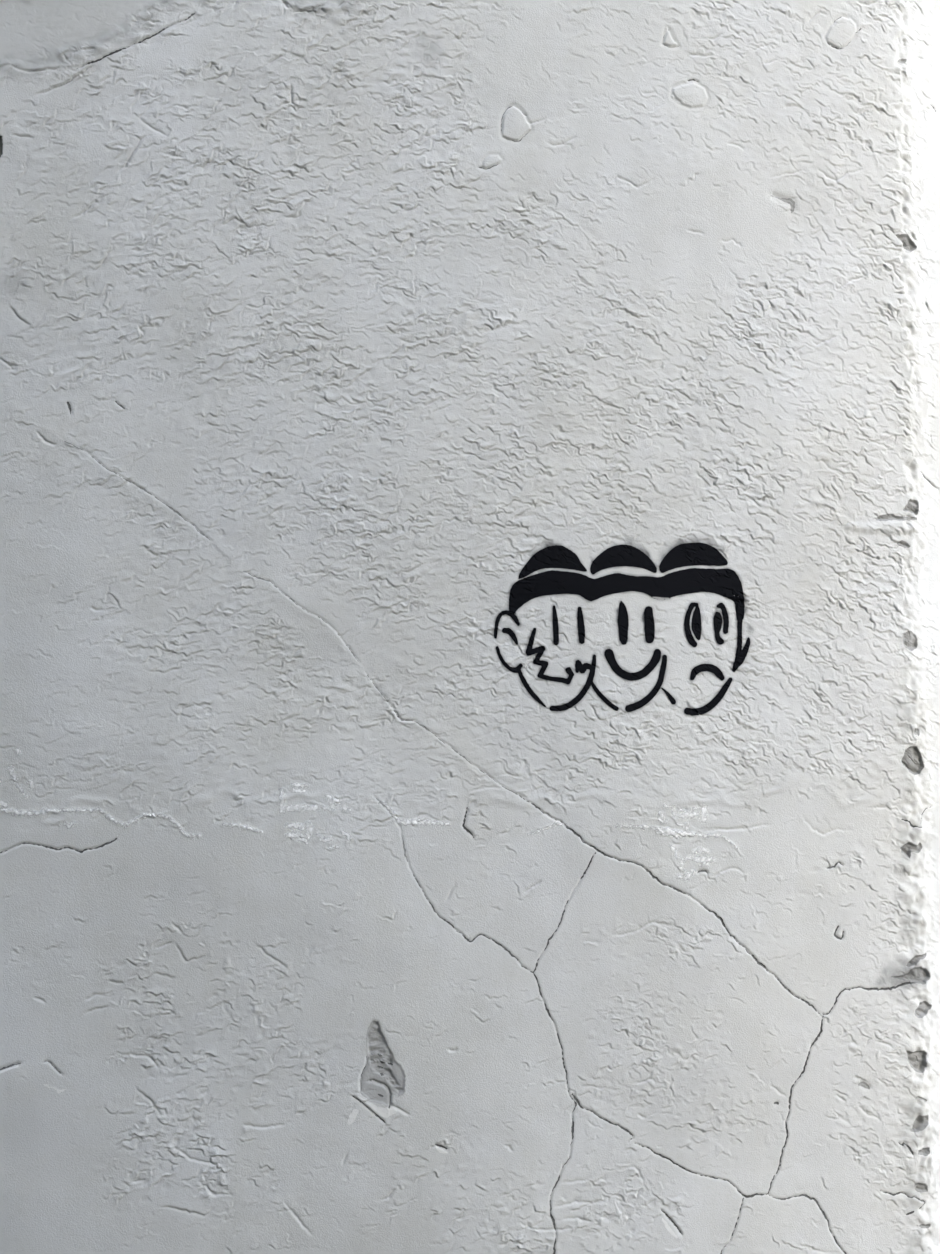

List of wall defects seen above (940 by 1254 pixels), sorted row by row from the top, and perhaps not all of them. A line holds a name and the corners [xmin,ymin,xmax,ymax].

crack [77,13,195,69]
crack [64,441,210,540]
hole [901,728,924,775]
crack [0,838,117,853]
hole [900,842,923,858]
crack [243,571,915,1254]
hole [891,953,930,985]
hole [915,1001,932,1018]
spalling [347,1021,406,1125]
hole [906,1050,927,1073]
hole [910,1096,929,1133]
crack [880,1190,925,1215]